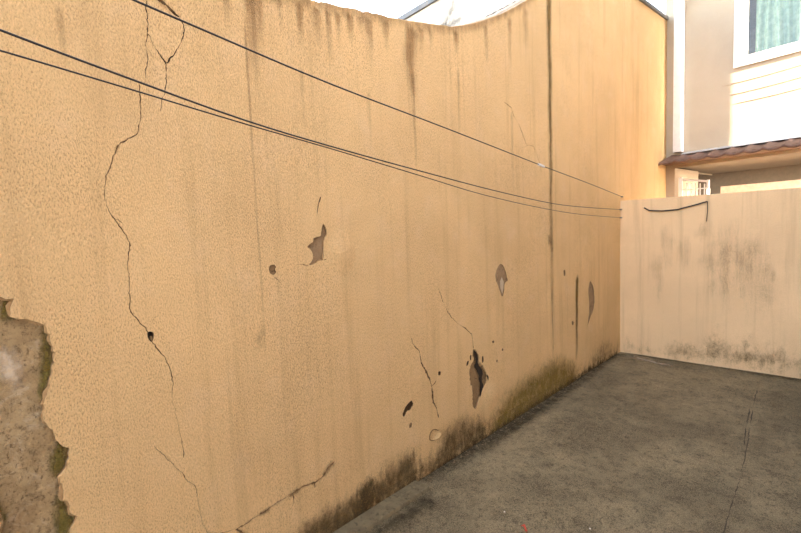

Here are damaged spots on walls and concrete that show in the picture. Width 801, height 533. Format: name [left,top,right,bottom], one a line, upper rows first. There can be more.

crack [104,0,185,390]
flaking render [308,224,327,265]
flaking render [495,264,508,296]
flaking render [0,297,77,533]
crack [154,414,334,533]
crack [412,342,439,418]
flaking render [466,349,489,409]
water stain [423,355,619,479]